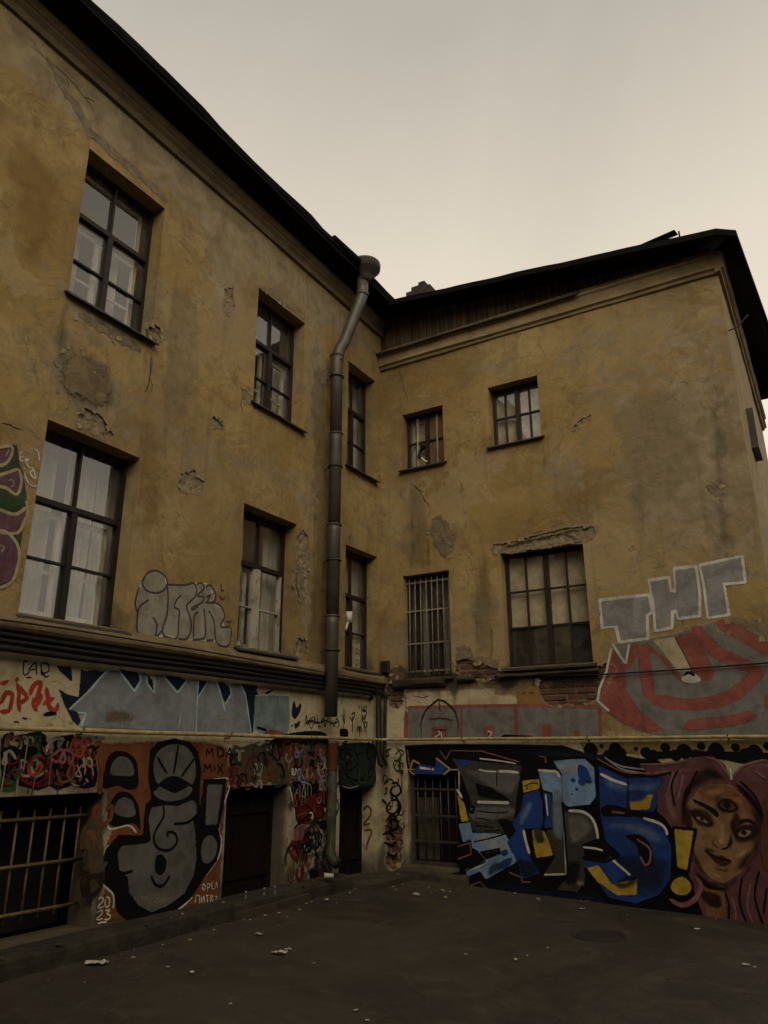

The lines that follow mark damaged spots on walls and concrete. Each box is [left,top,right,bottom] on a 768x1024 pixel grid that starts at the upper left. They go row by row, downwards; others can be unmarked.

peeling [74,311,164,352]
spalling [75,406,115,442]
spalling [490,524,597,555]
spalling [453,644,505,683]
spalling [535,660,617,709]
spalling [382,812,404,871]